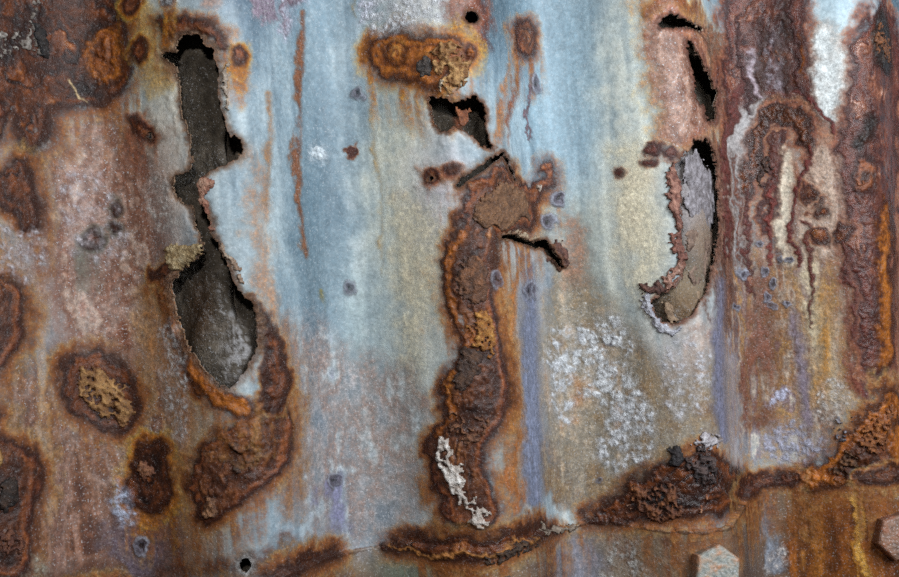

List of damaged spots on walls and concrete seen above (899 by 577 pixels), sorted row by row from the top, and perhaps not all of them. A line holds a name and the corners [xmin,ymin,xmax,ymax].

peeling [163,243,203,271]
peeling [196,176,215,231]
rust [0,0,571,577]
peeling [455,107,472,126]
peeling [638,48,764,324]
rust [538,0,899,577]